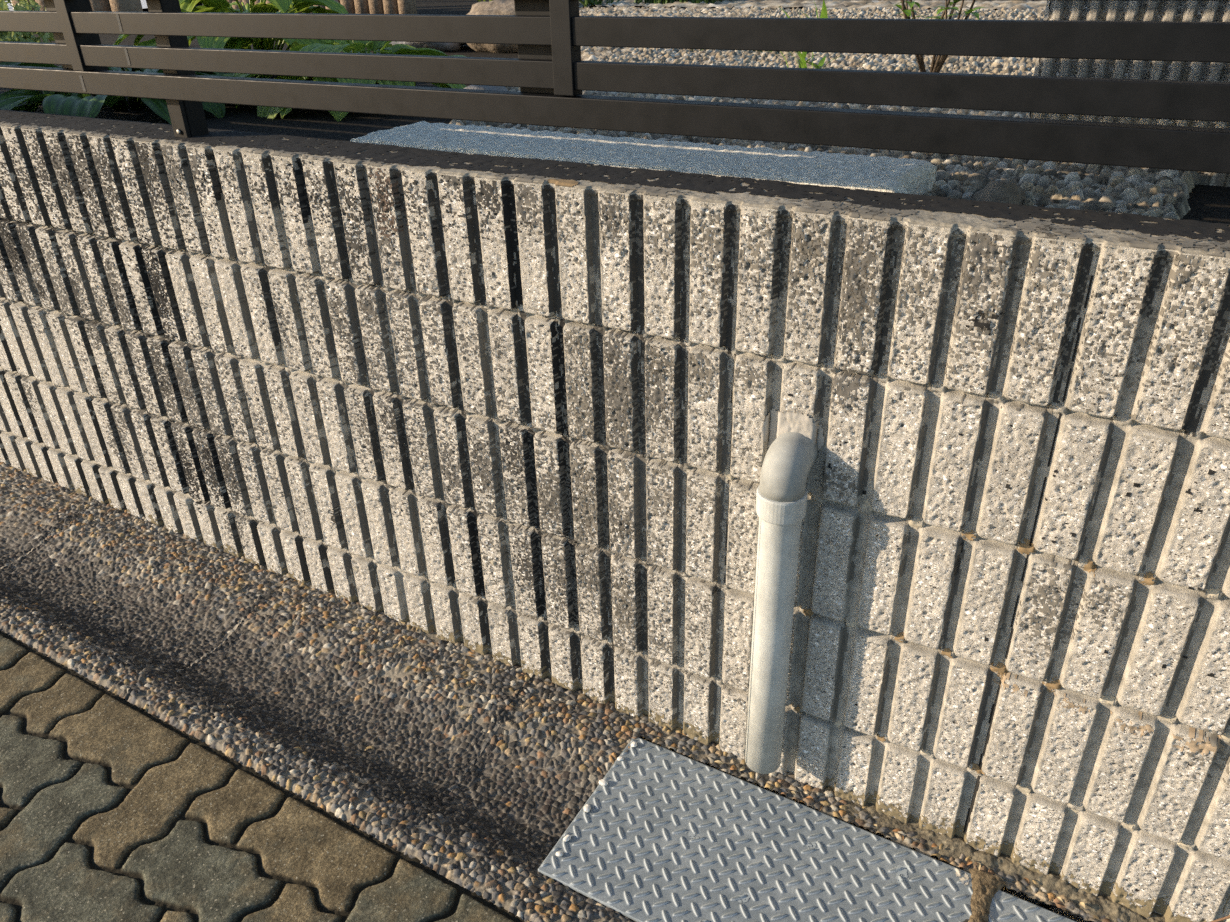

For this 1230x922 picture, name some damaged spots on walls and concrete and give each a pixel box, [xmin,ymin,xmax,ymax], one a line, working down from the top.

leakage [0,511,553,880]